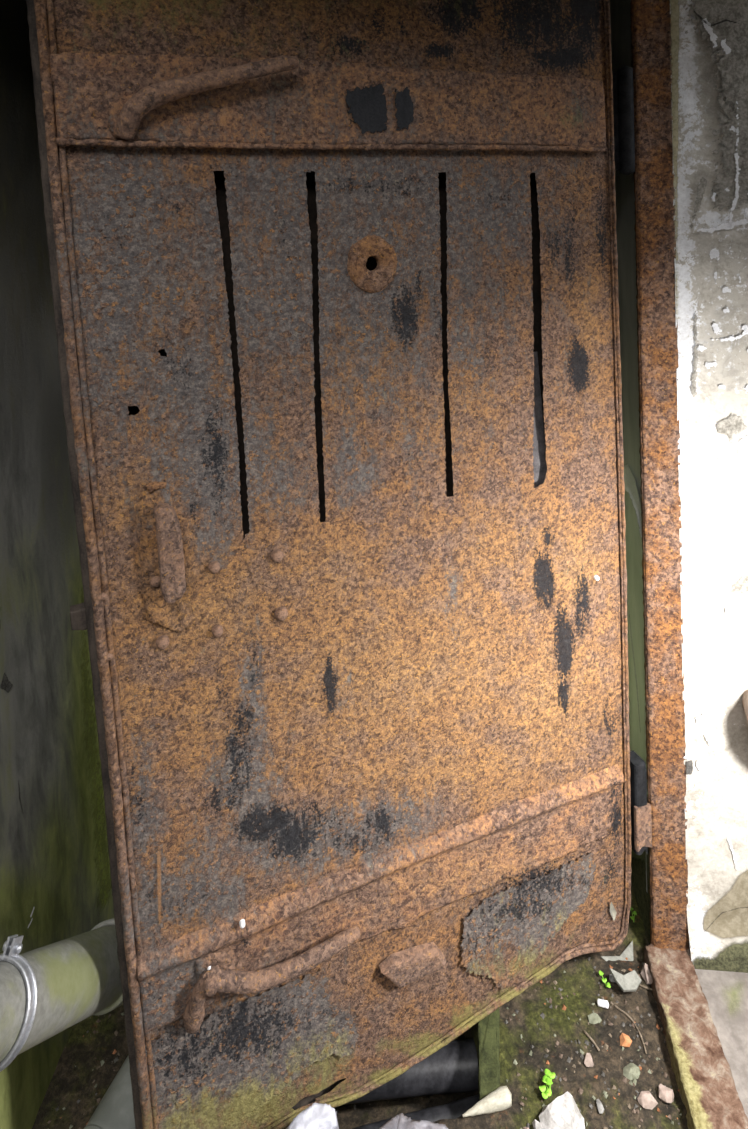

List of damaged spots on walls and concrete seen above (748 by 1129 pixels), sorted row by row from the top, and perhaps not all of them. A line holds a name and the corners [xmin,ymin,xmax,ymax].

peeling [683,0,748,228]
peeling [709,248,741,293]
peeling [691,307,748,397]